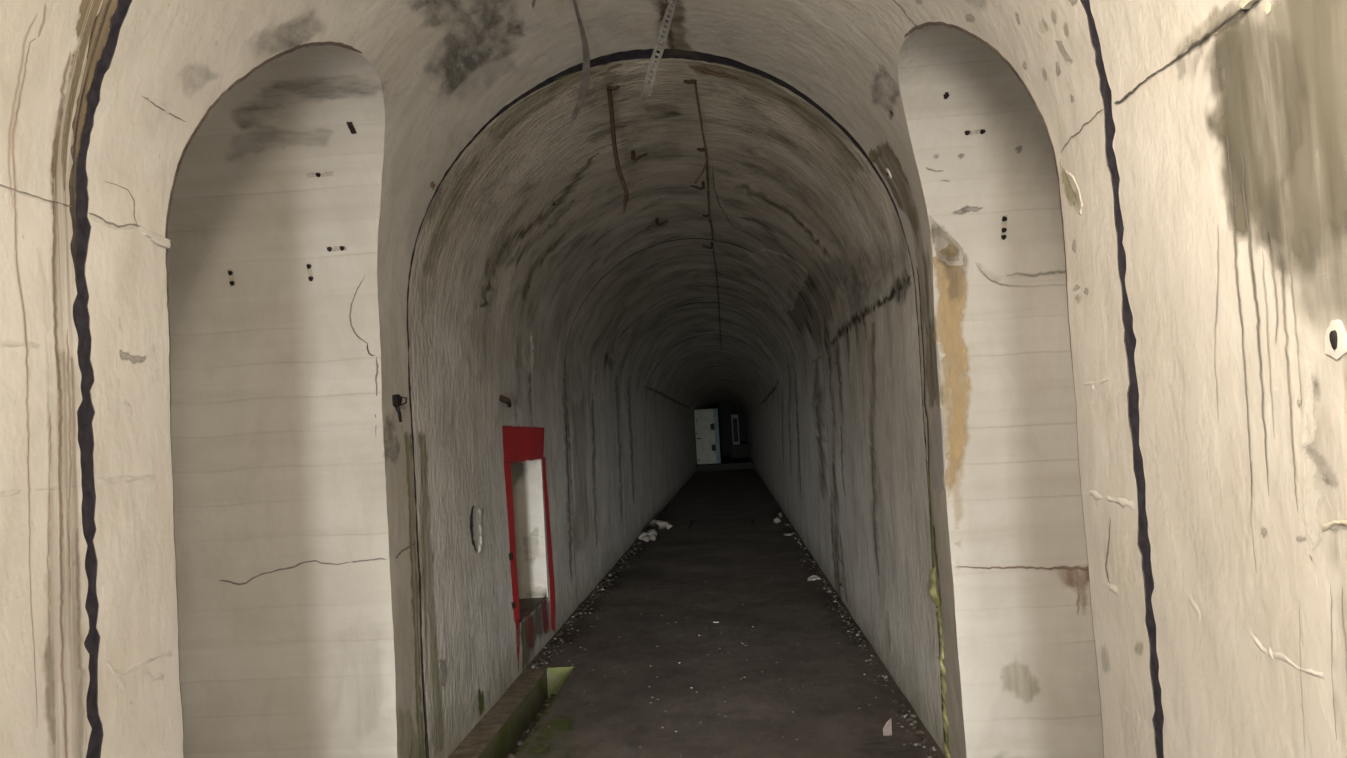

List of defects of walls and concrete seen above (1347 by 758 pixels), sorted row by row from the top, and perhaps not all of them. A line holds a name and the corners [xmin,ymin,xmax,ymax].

mould [429,0,505,90]
peeling [1043,12,1072,78]
crack [1061,0,1272,153]
crack [0,181,171,249]
leakage [904,22,1078,438]
leakage [1208,0,1347,510]
hole [1324,319,1347,360]
crack [218,543,429,758]
leakage [928,527,951,758]
corrosion [959,566,1090,585]